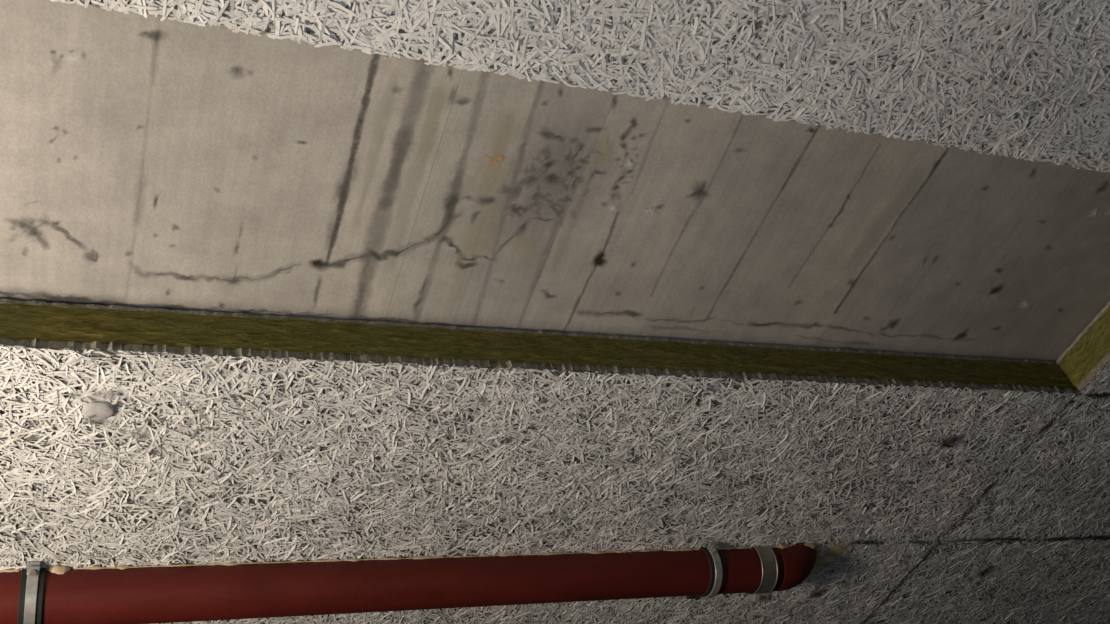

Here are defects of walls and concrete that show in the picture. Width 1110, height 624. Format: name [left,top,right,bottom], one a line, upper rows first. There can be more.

damp [327,55,378,259]
crack [324,250,404,267]
crack [438,226,486,268]